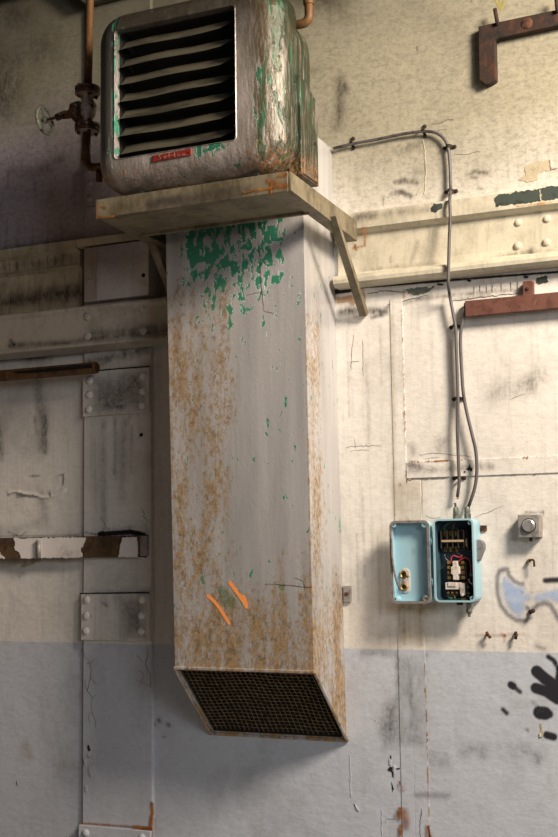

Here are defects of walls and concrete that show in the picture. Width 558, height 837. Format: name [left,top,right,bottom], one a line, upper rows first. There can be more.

peeling [494,160,558,207]
corrosion [80,802,154,833]
corrosion [398,807,408,836]